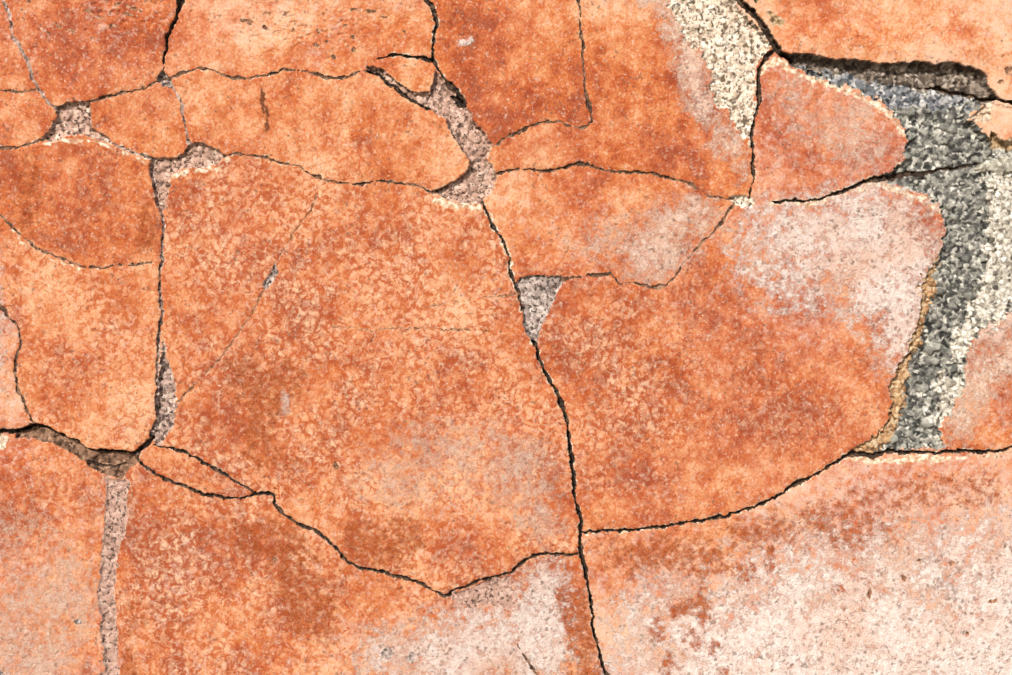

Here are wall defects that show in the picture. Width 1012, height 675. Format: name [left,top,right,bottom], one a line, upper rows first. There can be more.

crack [0,0,61,113]
crack [89,0,468,146]
crack [224,152,449,263]
flaking render [367,66,497,205]
flaking render [516,275,563,342]
flaking render [666,0,771,145]
crack [492,0,977,290]
flaking render [728,194,755,208]
flaking render [784,53,1012,453]
crack [916,85,1012,105]
flaking render [0,342,178,675]
crack [0,200,1012,675]